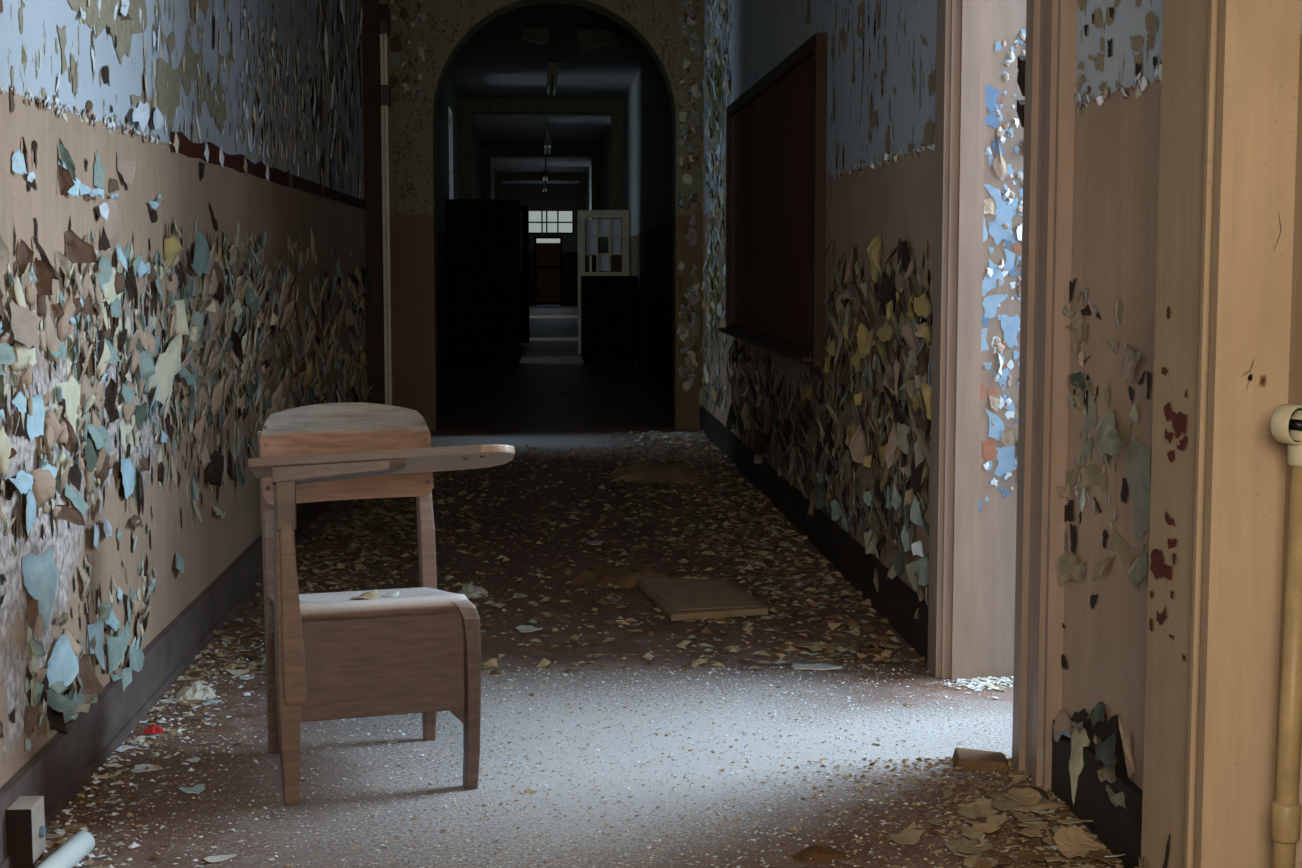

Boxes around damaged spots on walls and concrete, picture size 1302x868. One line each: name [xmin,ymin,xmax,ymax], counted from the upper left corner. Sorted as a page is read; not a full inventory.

peeling [1,0,364,202]
peeling [1074,0,1162,115]
peeling [0,136,373,754]
peeling [677,0,935,619]
peeling [978,29,1026,512]
peeling [1055,278,1151,609]
peeling [1040,701,1136,809]